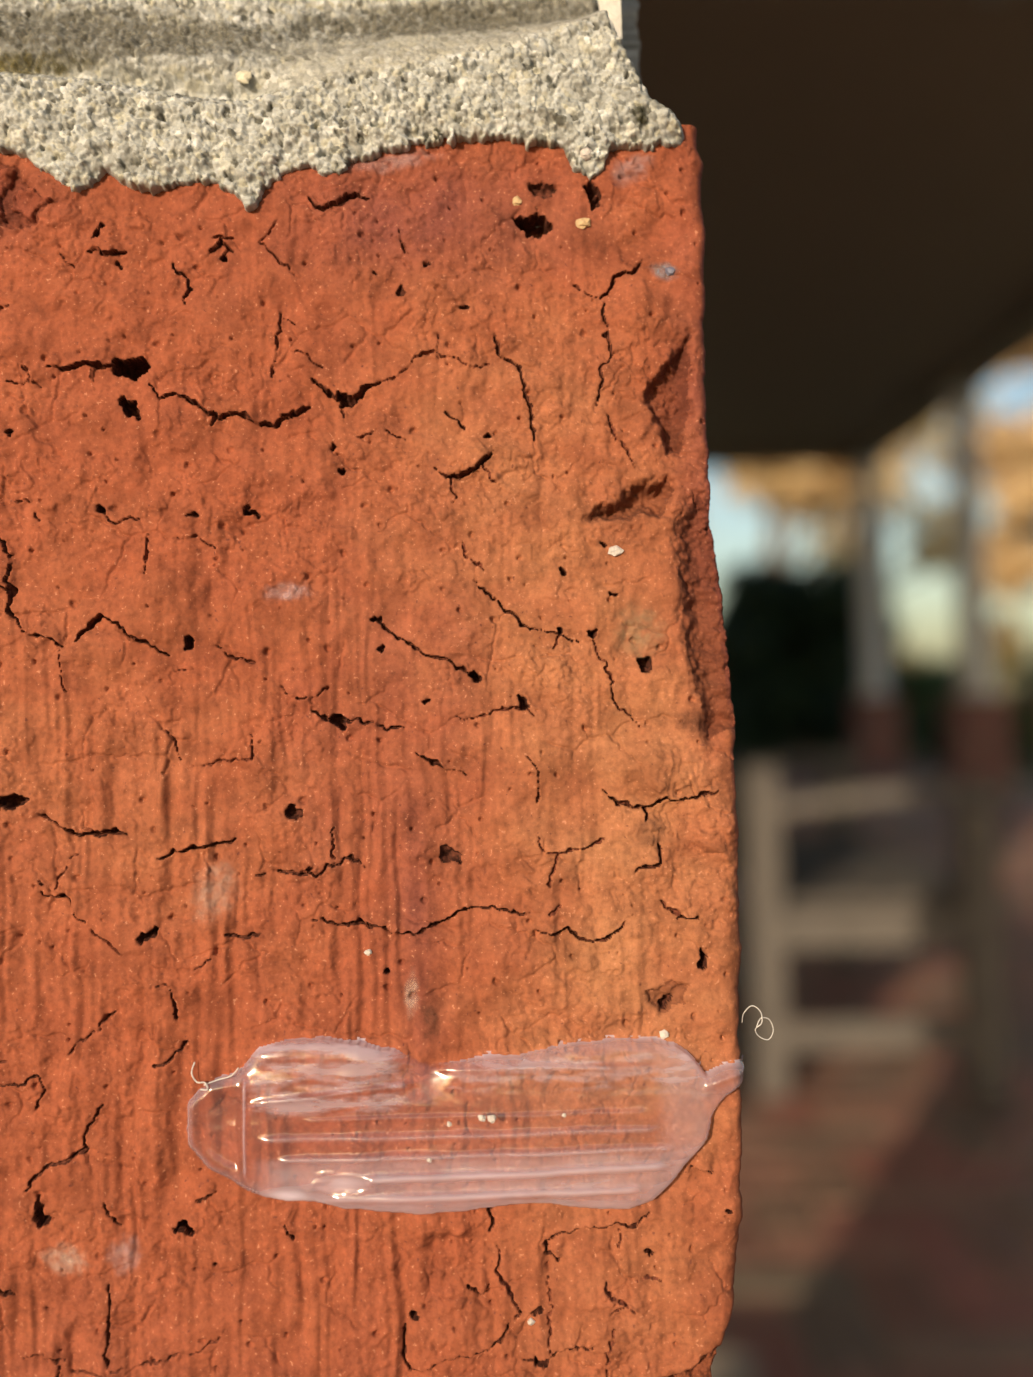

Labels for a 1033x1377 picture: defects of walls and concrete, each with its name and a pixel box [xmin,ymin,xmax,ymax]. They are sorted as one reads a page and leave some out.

crack [6,360,118,388]
crack [148,313,536,441]
crack [573,264,641,462]
crack [434,411,496,503]
crack [0,538,186,691]
crack [460,543,640,727]
crack [38,814,126,954]
crack [257,827,365,878]
crack [312,837,625,943]
crack [602,789,717,872]
crack [25,1104,103,1212]
crack [402,1207,662,1377]